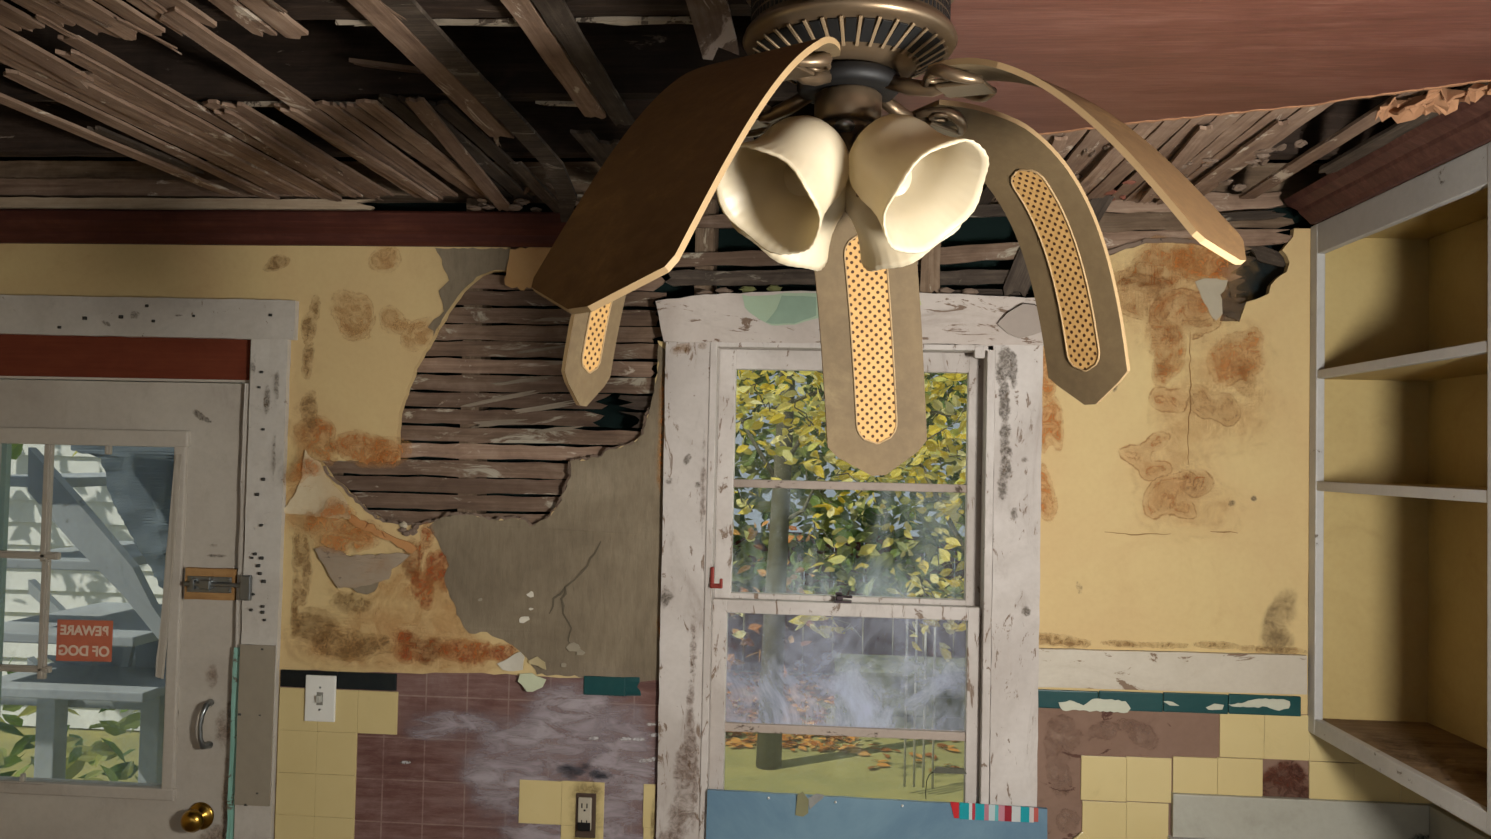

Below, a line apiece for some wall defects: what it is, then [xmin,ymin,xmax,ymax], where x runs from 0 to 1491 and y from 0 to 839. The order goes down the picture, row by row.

peeling [1375,82,1491,124]
flaking render [1099,198,1205,256]
spalling [1195,191,1294,322]
damp [1116,243,1229,405]
damp [293,399,406,481]
damp [292,503,389,662]
spalling [284,247,671,839]
crack [549,541,602,644]
peeling [1037,698,1306,839]
peeling [1252,758,1330,798]